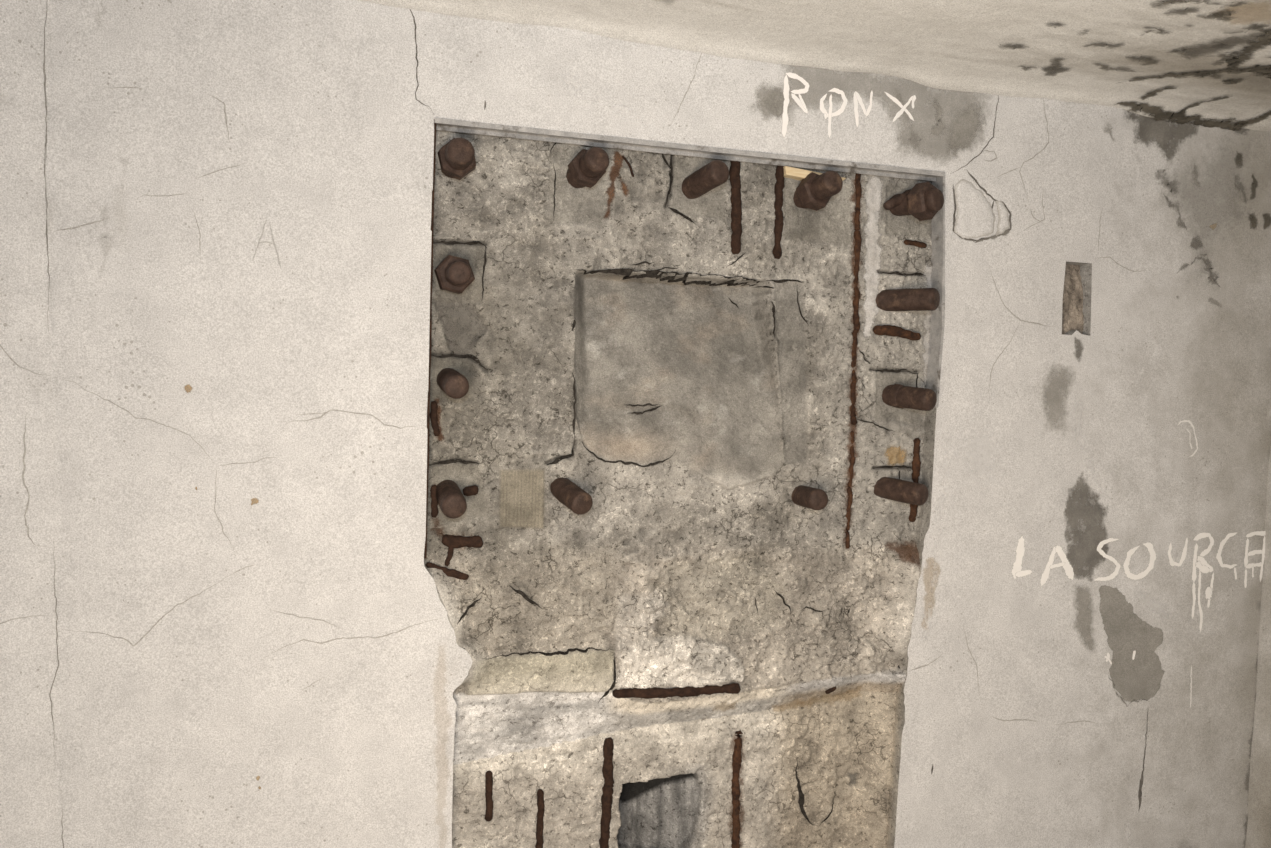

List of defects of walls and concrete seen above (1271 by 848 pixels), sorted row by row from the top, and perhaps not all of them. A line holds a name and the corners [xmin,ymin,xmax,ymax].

crack [43,11,110,318]
crack [410,10,434,114]
rust [604,151,628,218]
damp [757,65,981,156]
damp [1020,59,1067,76]
damp [1127,111,1199,160]
rust [843,180,863,541]
crack [431,458,479,466]
crack [0,345,276,750]
peeling [445,547,454,566]
rust [887,542,920,564]
damp [1065,478,1108,650]